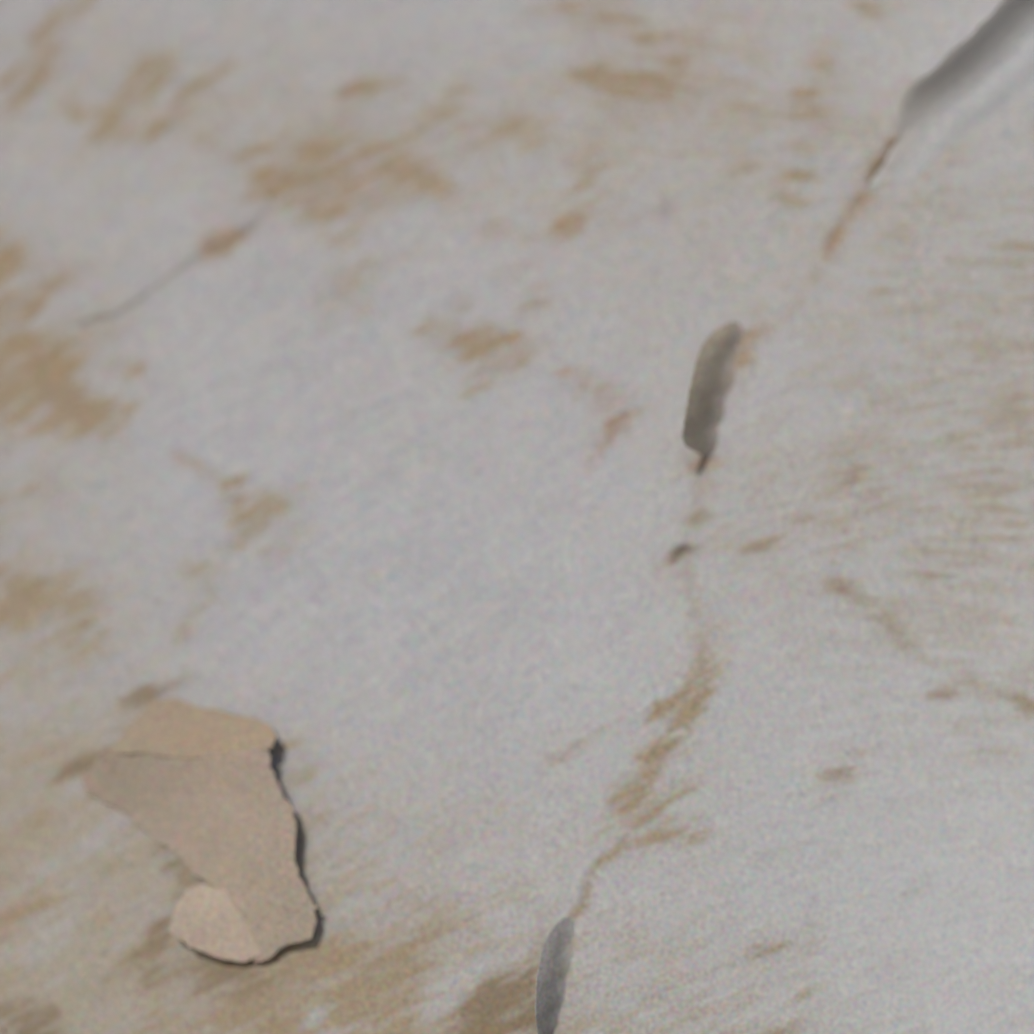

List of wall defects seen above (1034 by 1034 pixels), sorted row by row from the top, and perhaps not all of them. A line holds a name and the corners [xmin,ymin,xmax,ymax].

peeling [838,0,946,27]
peeling [869,0,1034,186]
peeling [0,206,153,468]
crack [114,214,261,313]
peeling [401,312,659,478]
peeling [664,300,776,484]
peeling [0,471,122,688]
peeling [155,441,326,655]
flaking render [586,607,745,863]
peeling [0,667,594,1034]